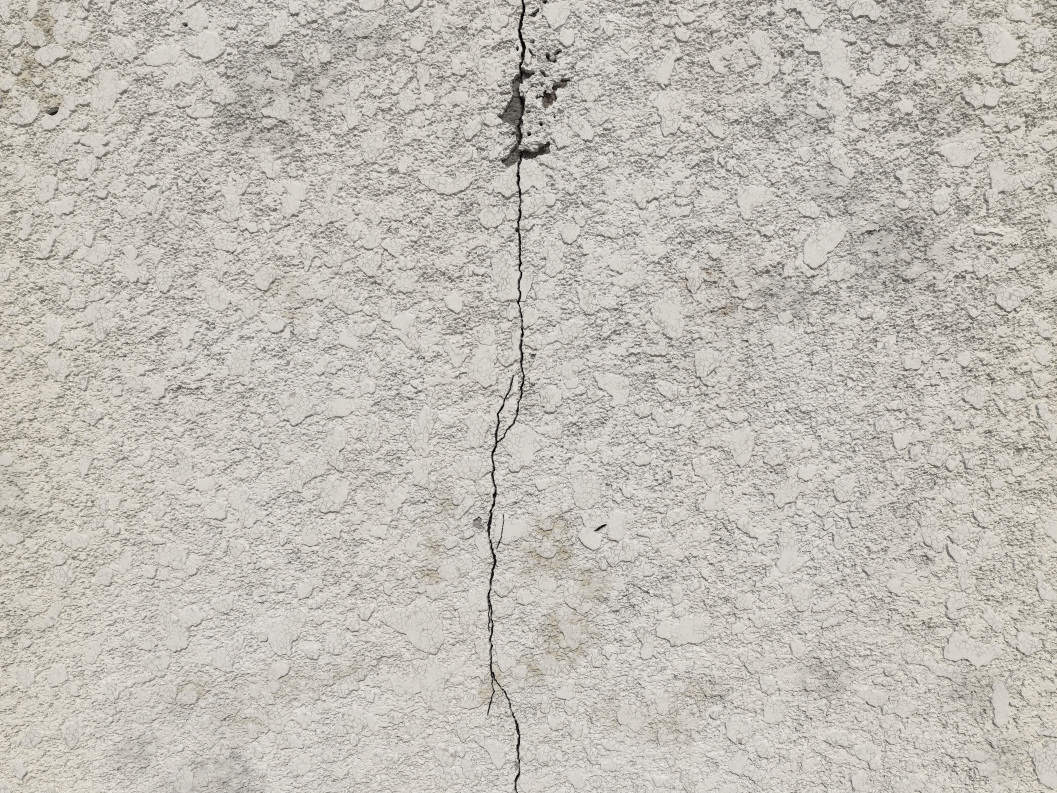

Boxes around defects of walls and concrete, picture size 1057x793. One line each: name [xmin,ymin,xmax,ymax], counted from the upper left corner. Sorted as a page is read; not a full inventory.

crack [487,0,526,793]
spalling [496,71,570,168]